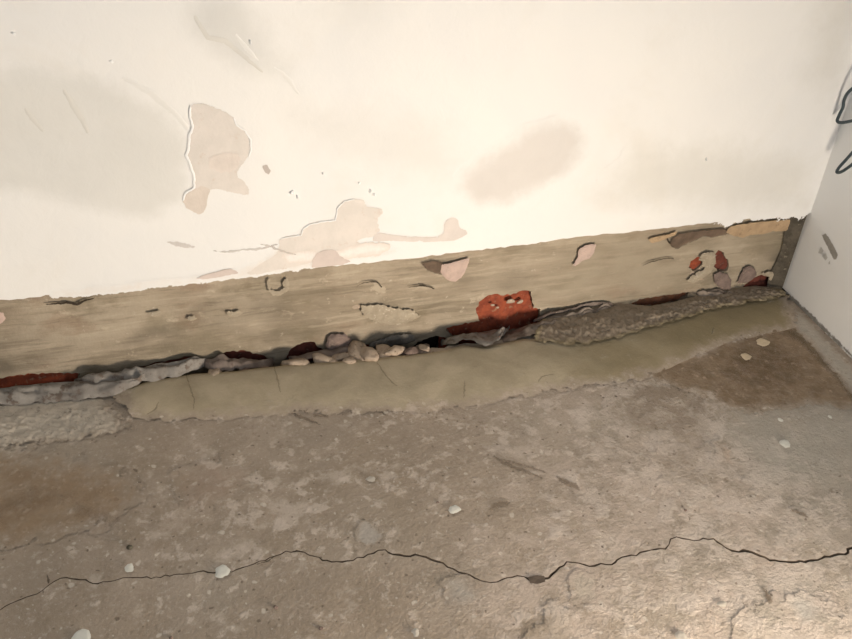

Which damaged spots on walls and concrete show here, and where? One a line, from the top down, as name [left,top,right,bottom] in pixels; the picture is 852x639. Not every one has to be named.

water stain [0,57,193,225]
peeling [183,103,252,214]
water stain [177,0,592,212]
peeling [49,199,467,299]
flaking render [0,373,78,388]
flaking render [223,350,268,360]
flaking render [287,342,323,362]
flaking render [413,290,538,348]
flaking render [632,293,685,306]
crack [0,536,852,610]